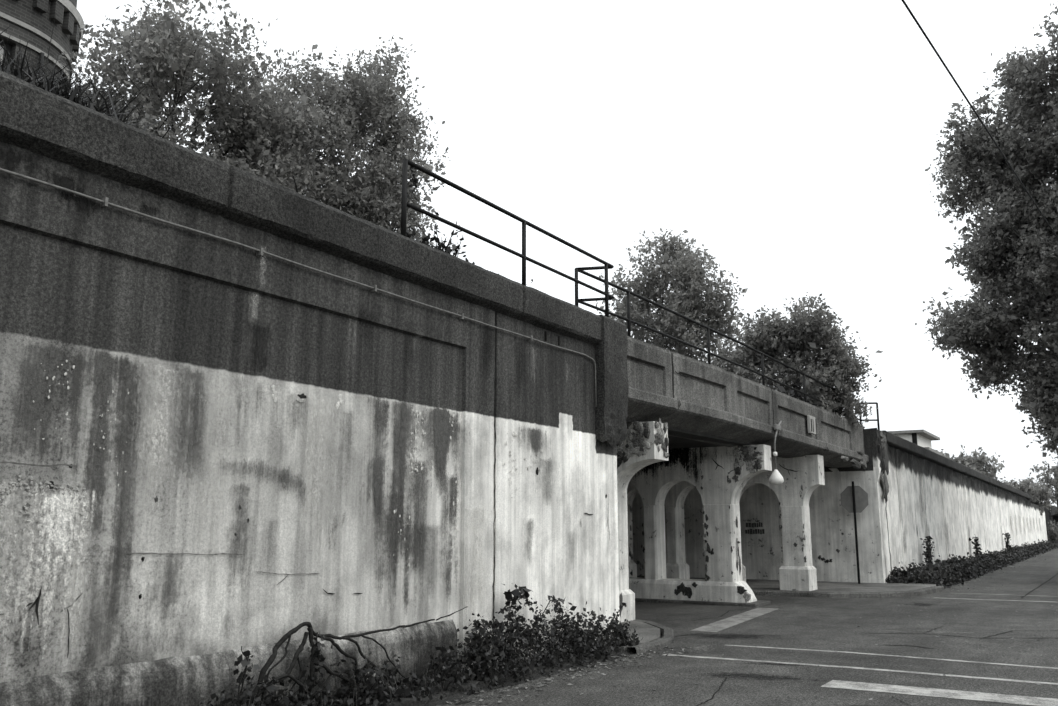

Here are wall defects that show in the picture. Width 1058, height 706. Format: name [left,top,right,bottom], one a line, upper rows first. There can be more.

leakage [0,345,141,660]
leakage [153,370,205,477]
leakage [367,398,470,607]
leakage [518,428,547,452]
spalling [617,419,669,469]
spalling [727,445,764,483]
leakage [154,554,178,613]
spalling [674,507,714,599]